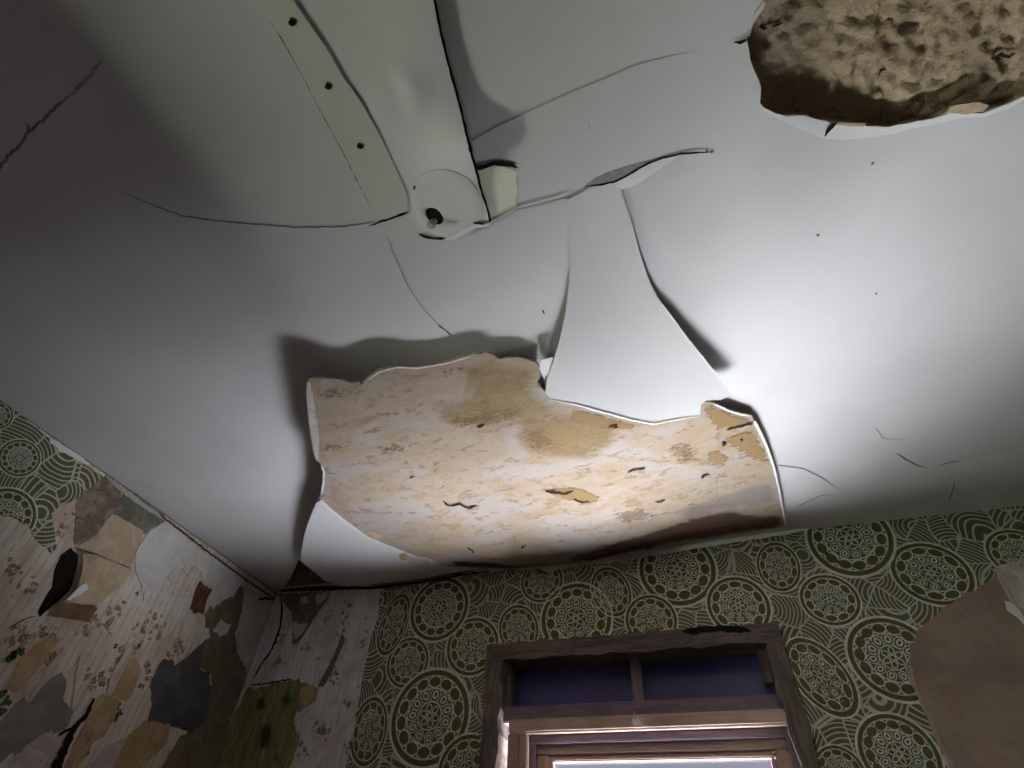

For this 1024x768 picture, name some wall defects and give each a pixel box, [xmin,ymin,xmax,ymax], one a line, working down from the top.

crack [0,60,103,169]
crack [120,23,376,228]
crack [586,152,709,187]
spalling [746,0,1024,140]
crack [418,232,445,240]
damp [444,368,610,456]
peeling [539,357,553,379]
peeling [705,405,842,509]
crack [876,429,959,502]
flaking render [38,476,246,768]
flaking render [992,558,1024,624]
damp [213,679,317,768]